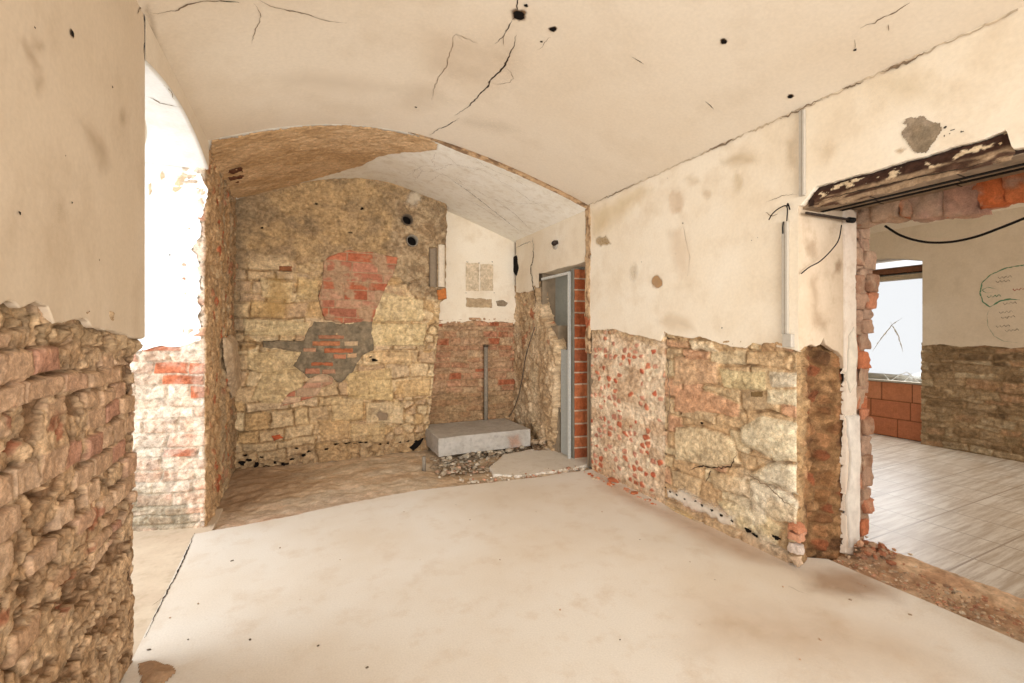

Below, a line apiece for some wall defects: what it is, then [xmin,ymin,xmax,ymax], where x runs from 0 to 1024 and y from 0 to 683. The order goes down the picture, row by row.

crack [138,0,343,47]
crack [407,0,537,303]
spalling [0,303,143,683]
spalling [210,125,1024,567]